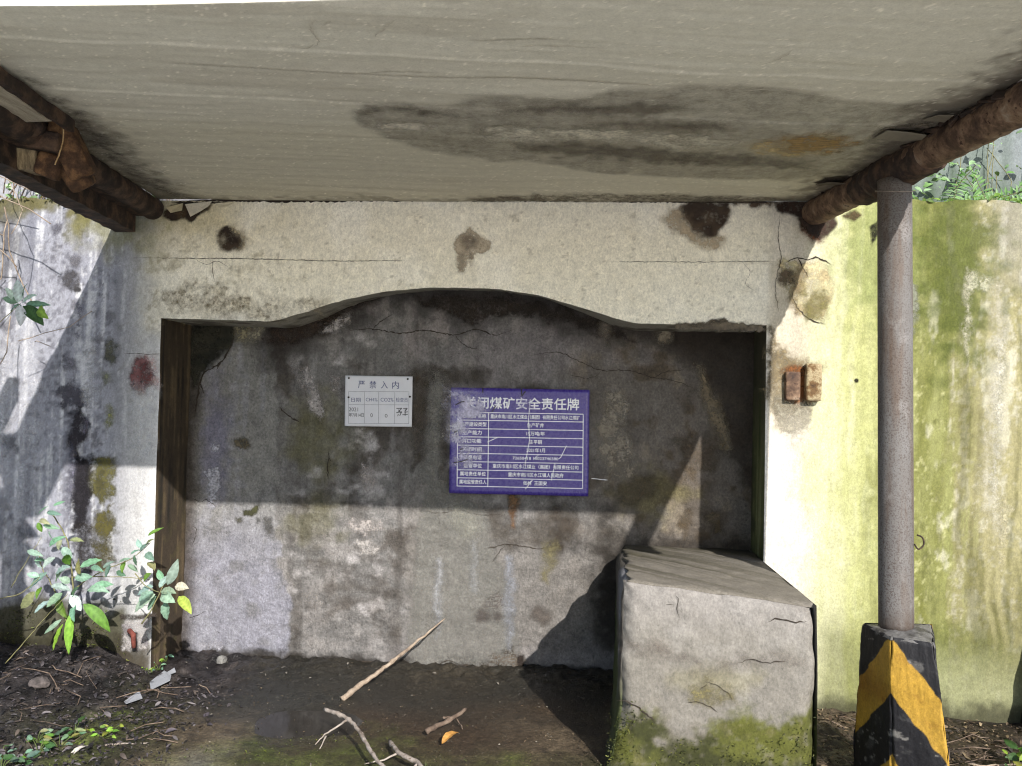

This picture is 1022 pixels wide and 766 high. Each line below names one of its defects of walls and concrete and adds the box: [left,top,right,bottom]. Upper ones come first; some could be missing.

water stain [486,104,756,172]
spalling [217,226,245,252]
crack [172,198,413,206]
spalling [666,202,730,249]
crack [620,201,830,324]
crack [344,314,511,349]
water stain [963,274,973,353]
rust [130,356,159,393]
rust [766,326,811,433]
water stain [56,382,117,586]